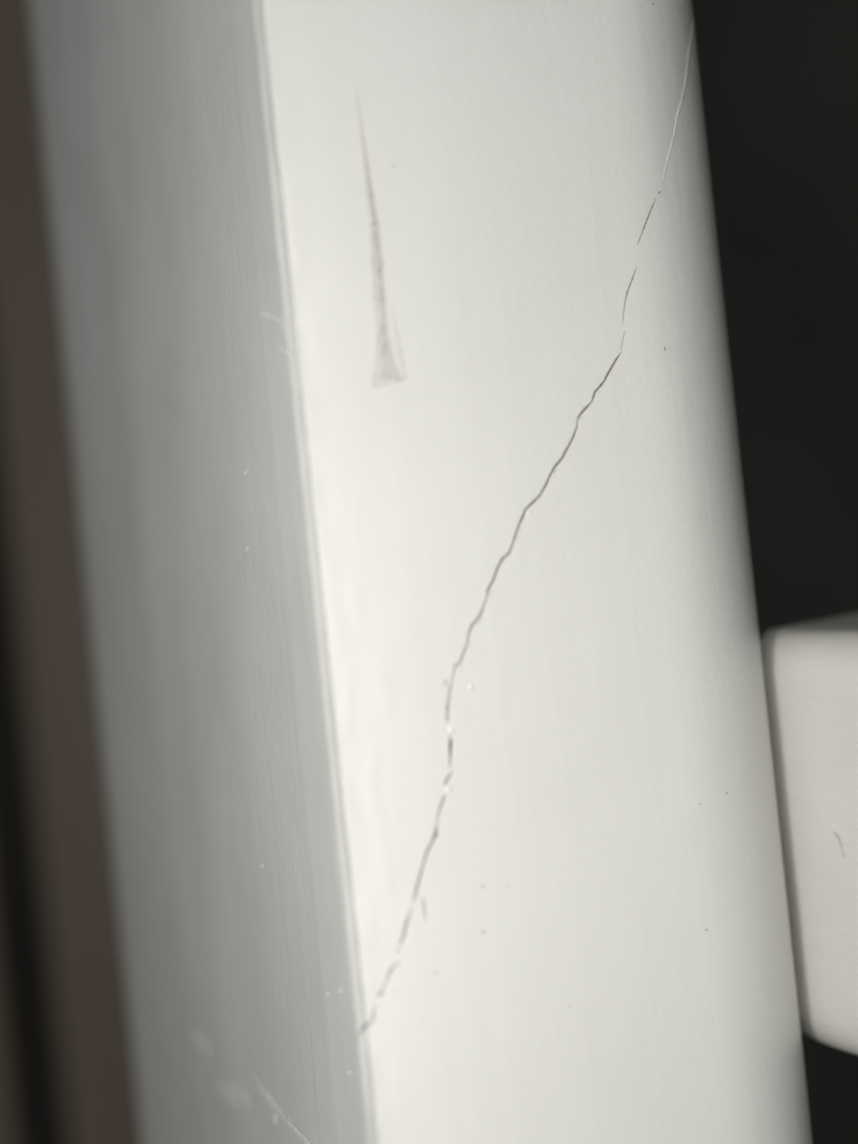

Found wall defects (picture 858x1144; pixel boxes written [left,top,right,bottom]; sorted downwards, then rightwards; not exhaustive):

crack [639,20,694,239]
crack [361,353,621,1031]